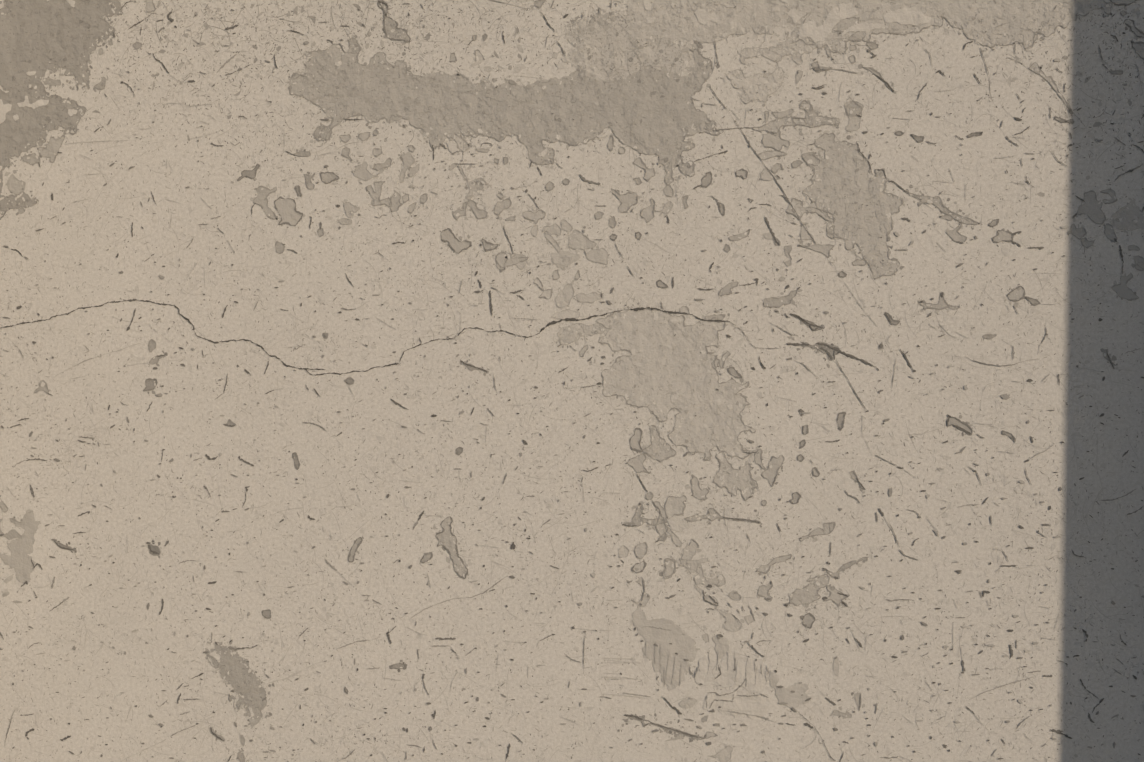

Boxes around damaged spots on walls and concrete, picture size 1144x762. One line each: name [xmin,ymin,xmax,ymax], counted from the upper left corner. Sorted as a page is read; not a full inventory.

peeling [0,0,156,214]
peeling [1007,286,1041,305]
crack [1,299,776,375]
peeling [289,34,868,642]
peeling [947,416,973,435]